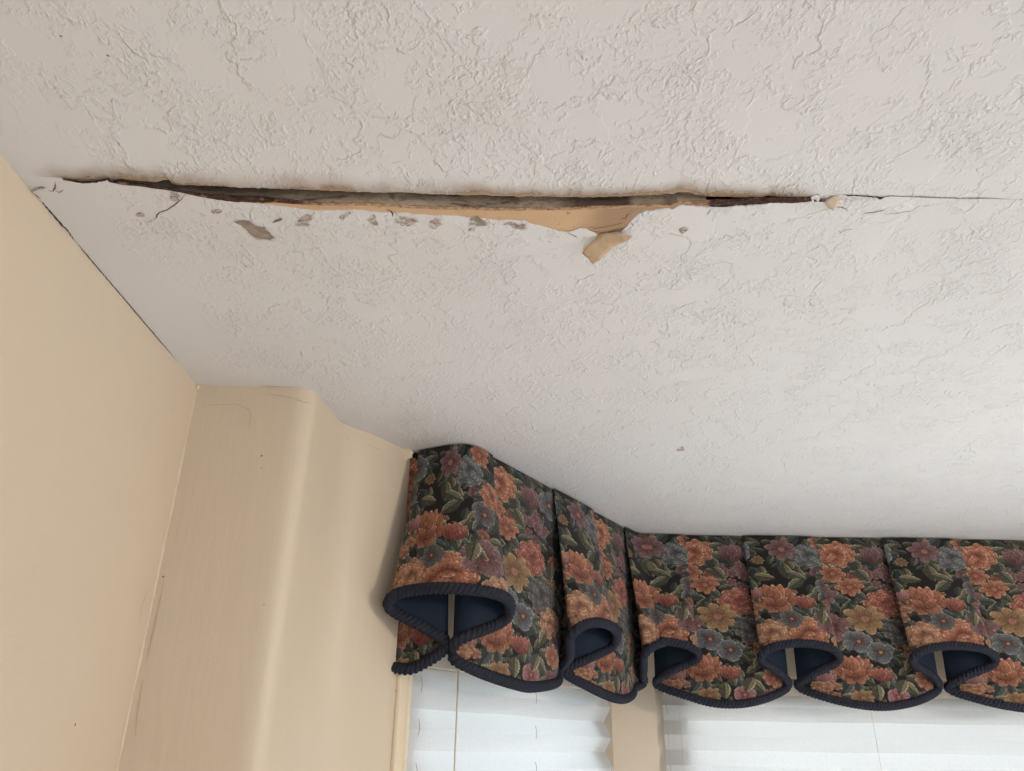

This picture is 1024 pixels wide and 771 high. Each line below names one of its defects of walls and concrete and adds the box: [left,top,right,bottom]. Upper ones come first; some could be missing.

spalling [235,218,283,240]
crack [32,178,999,361]